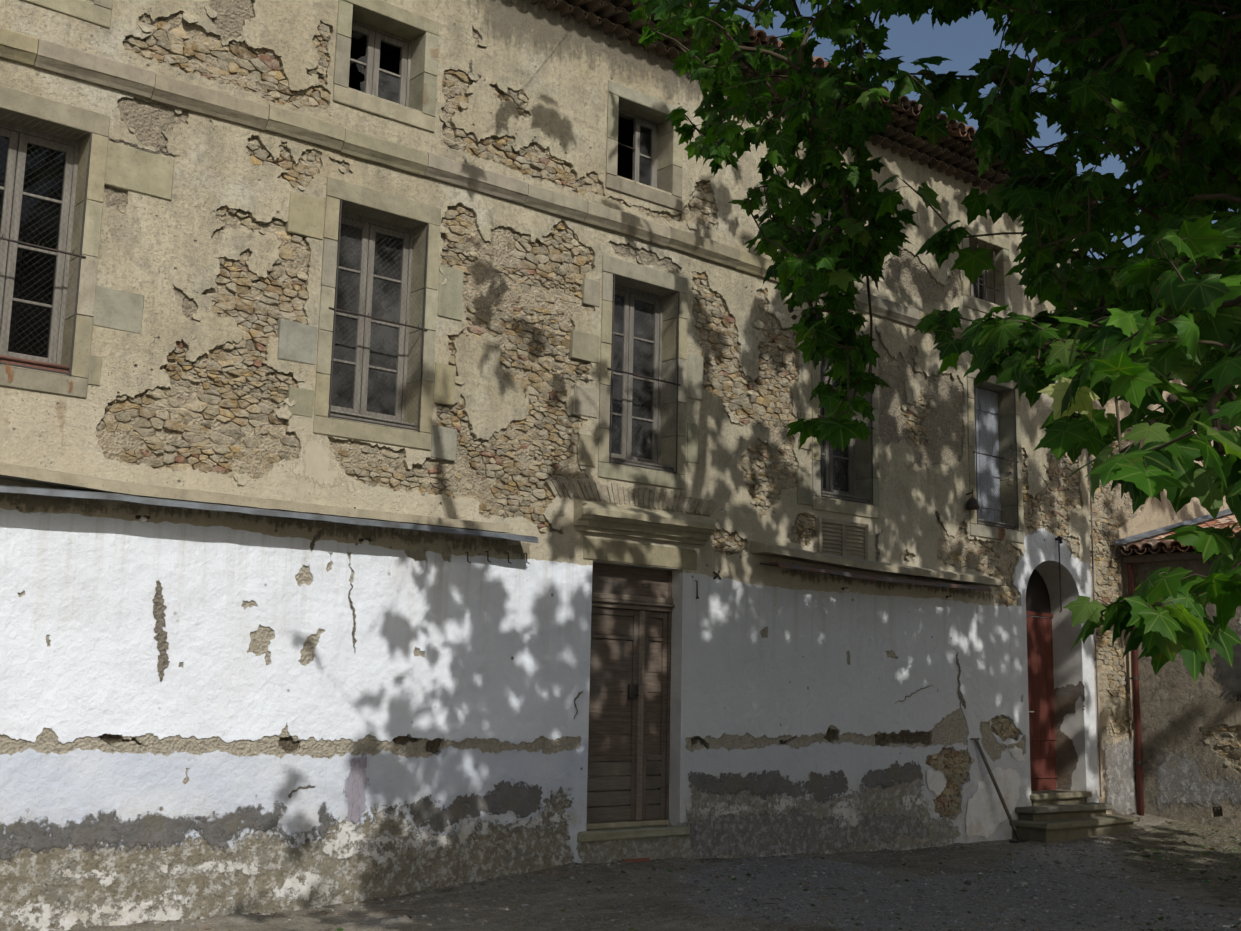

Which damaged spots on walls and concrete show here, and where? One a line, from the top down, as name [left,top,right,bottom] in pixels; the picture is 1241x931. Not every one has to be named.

spalling [122,0,331,109]
spalling [96,205,310,486]
spalling [328,203,594,535]
spalling [608,241,799,519]
spalling [875,327,964,470]
crack [348,582,357,653]
crack [895,652,966,709]
peeling [0,708,1026,931]